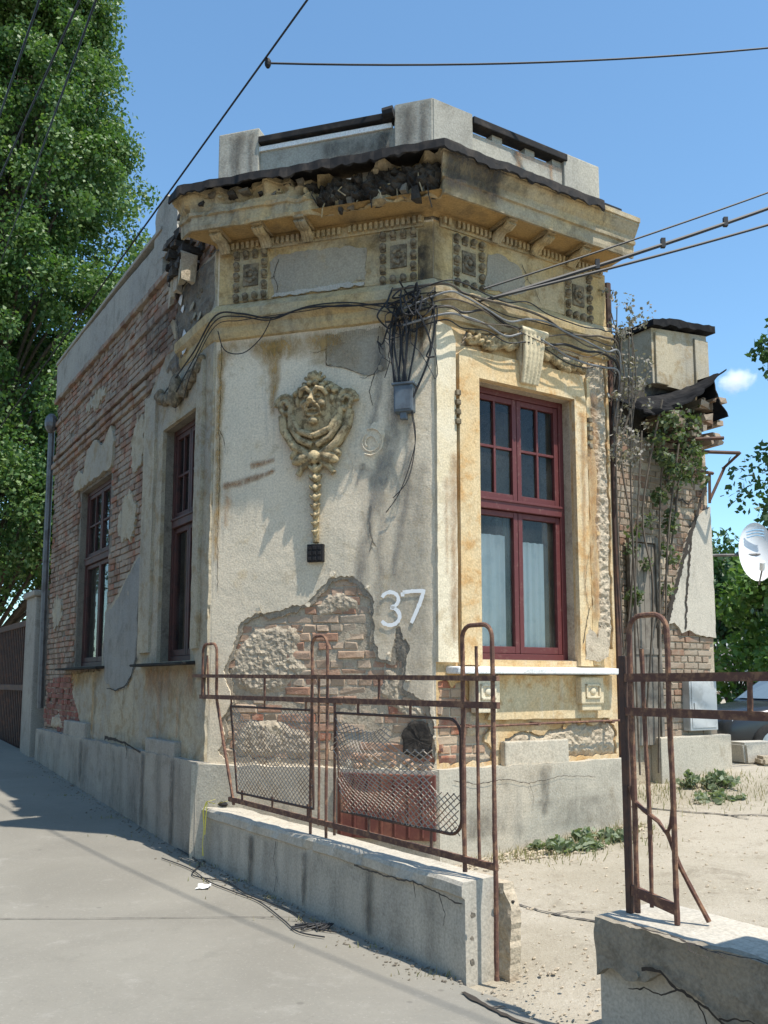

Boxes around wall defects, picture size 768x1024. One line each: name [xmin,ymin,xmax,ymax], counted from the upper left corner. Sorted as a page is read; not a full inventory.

spalling [198,162,441,218]
spalling [166,256,215,375]
spalling [558,353,612,662]
spalling [218,571,486,771]
spalling [43,677,79,732]
spalling [505,718,615,757]
crack [354,864,462,925]
crack [628,967,755,1024]